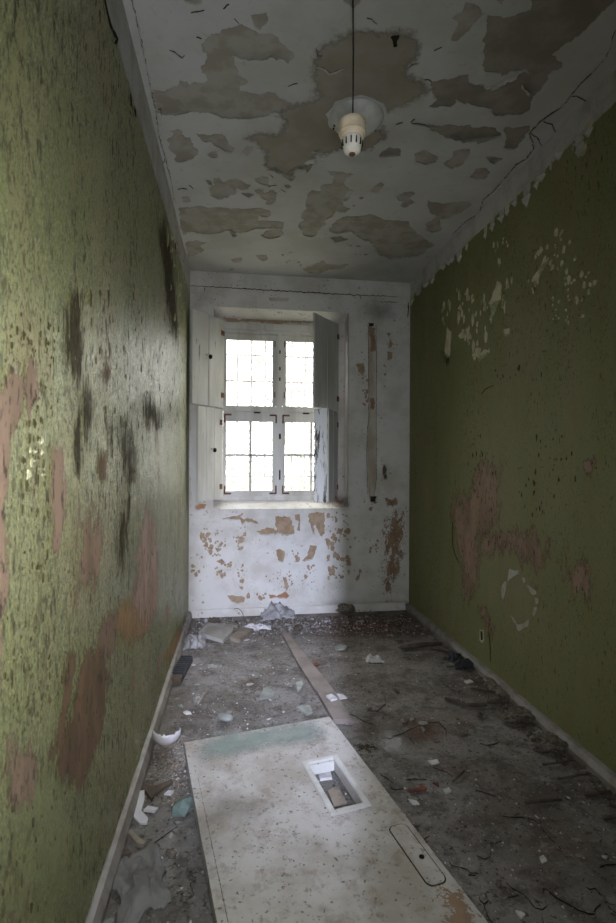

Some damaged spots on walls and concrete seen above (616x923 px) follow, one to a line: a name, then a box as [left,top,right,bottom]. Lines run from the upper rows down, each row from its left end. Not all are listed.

peeling [167,129,234,163]
peeling [153,12,295,120]
peeling [414,137,470,169]
peeling [429,0,615,181]
crack [453,30,616,234]
peeling [167,159,316,258]
peeling [297,171,472,260]
peeling [442,277,513,362]
peeling [4,312,60,583]
peeling [191,511,361,605]
peeling [501,569,538,631]
peeling [1,595,66,717]